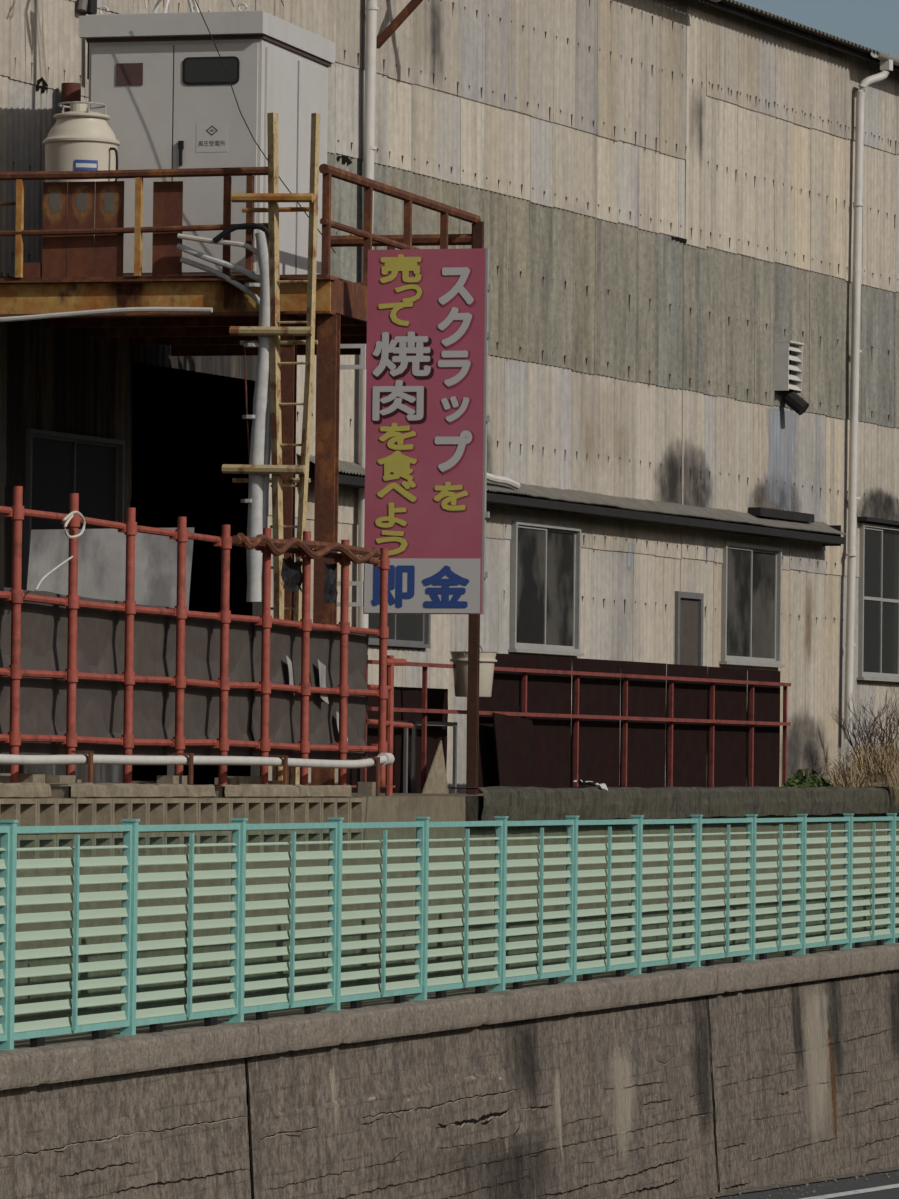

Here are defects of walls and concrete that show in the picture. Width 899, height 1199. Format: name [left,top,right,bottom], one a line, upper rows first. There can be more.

rust [111,283,144,307]
rust [220,282,247,307]
rust [828,1029,837,1131]
spalling [436,1105,552,1135]